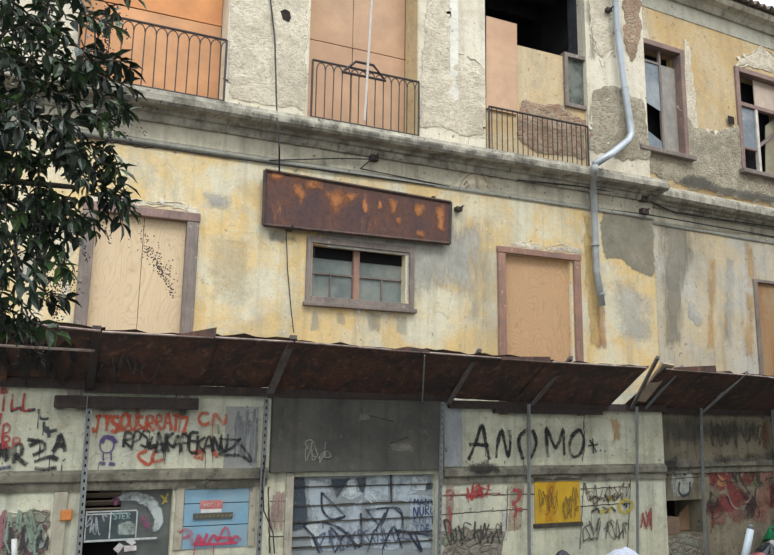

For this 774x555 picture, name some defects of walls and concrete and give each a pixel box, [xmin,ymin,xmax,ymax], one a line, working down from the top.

flaking render [589,0,649,68]
flaking render [518,39,774,207]
rust [294,181,368,212]
rust [378,200,401,223]
rust [436,207,444,230]